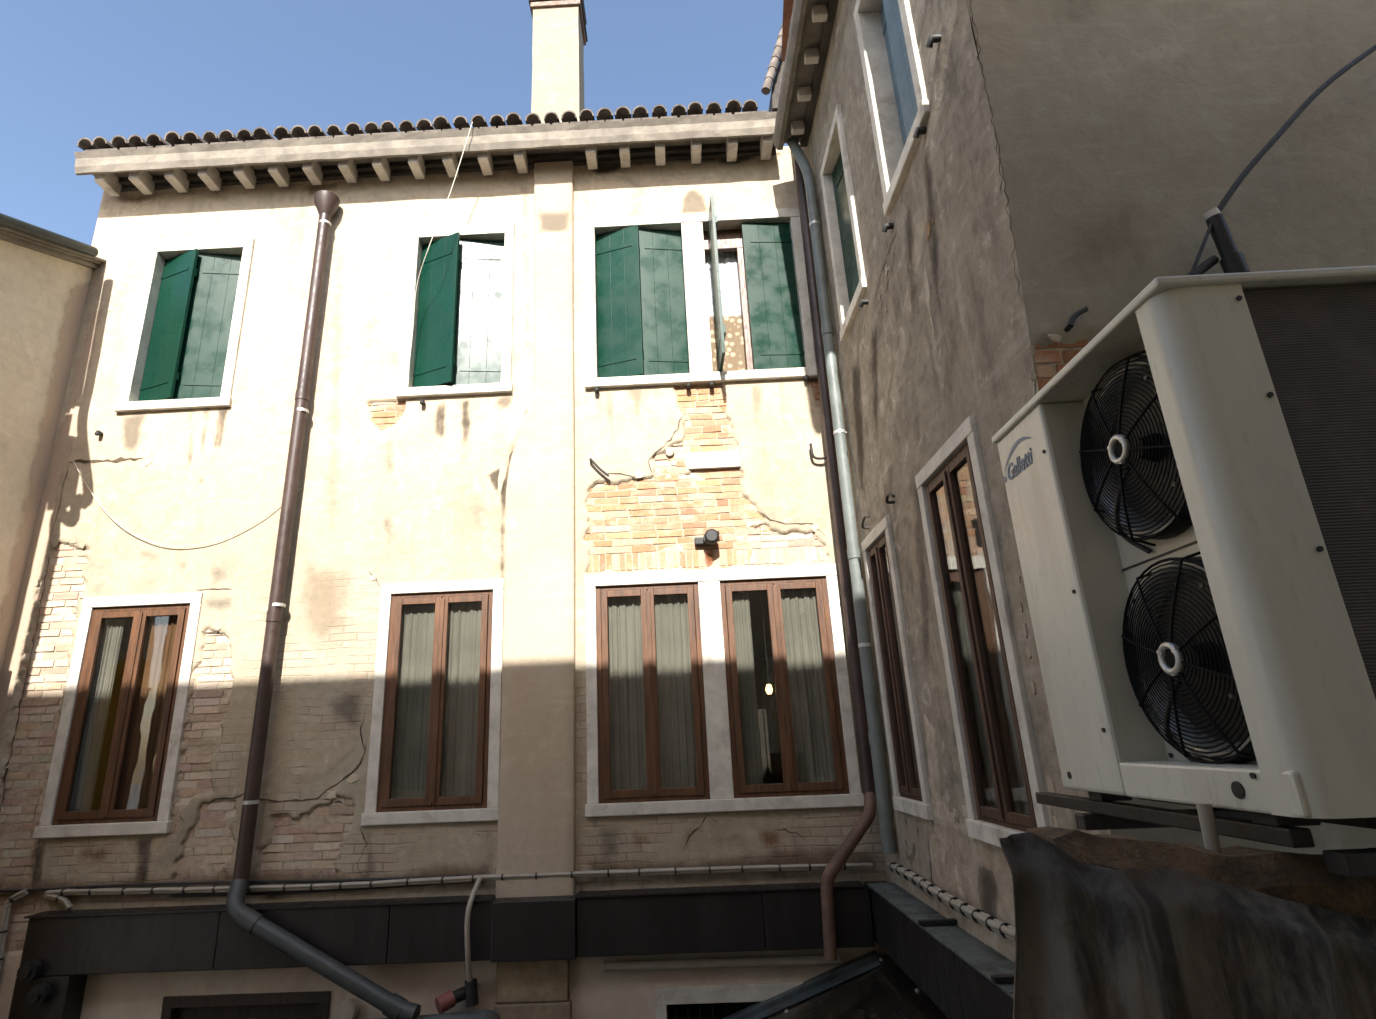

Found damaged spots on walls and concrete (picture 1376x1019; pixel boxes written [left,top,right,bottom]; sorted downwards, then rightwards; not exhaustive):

flaking render [368,401,406,431]
flaking render [584,379,829,575]
flaking render [1028,333,1088,391]
crack [0,457,153,811]
flaking render [0,535,90,952]
flaking render [169,629,236,882]
crack [210,715,368,877]